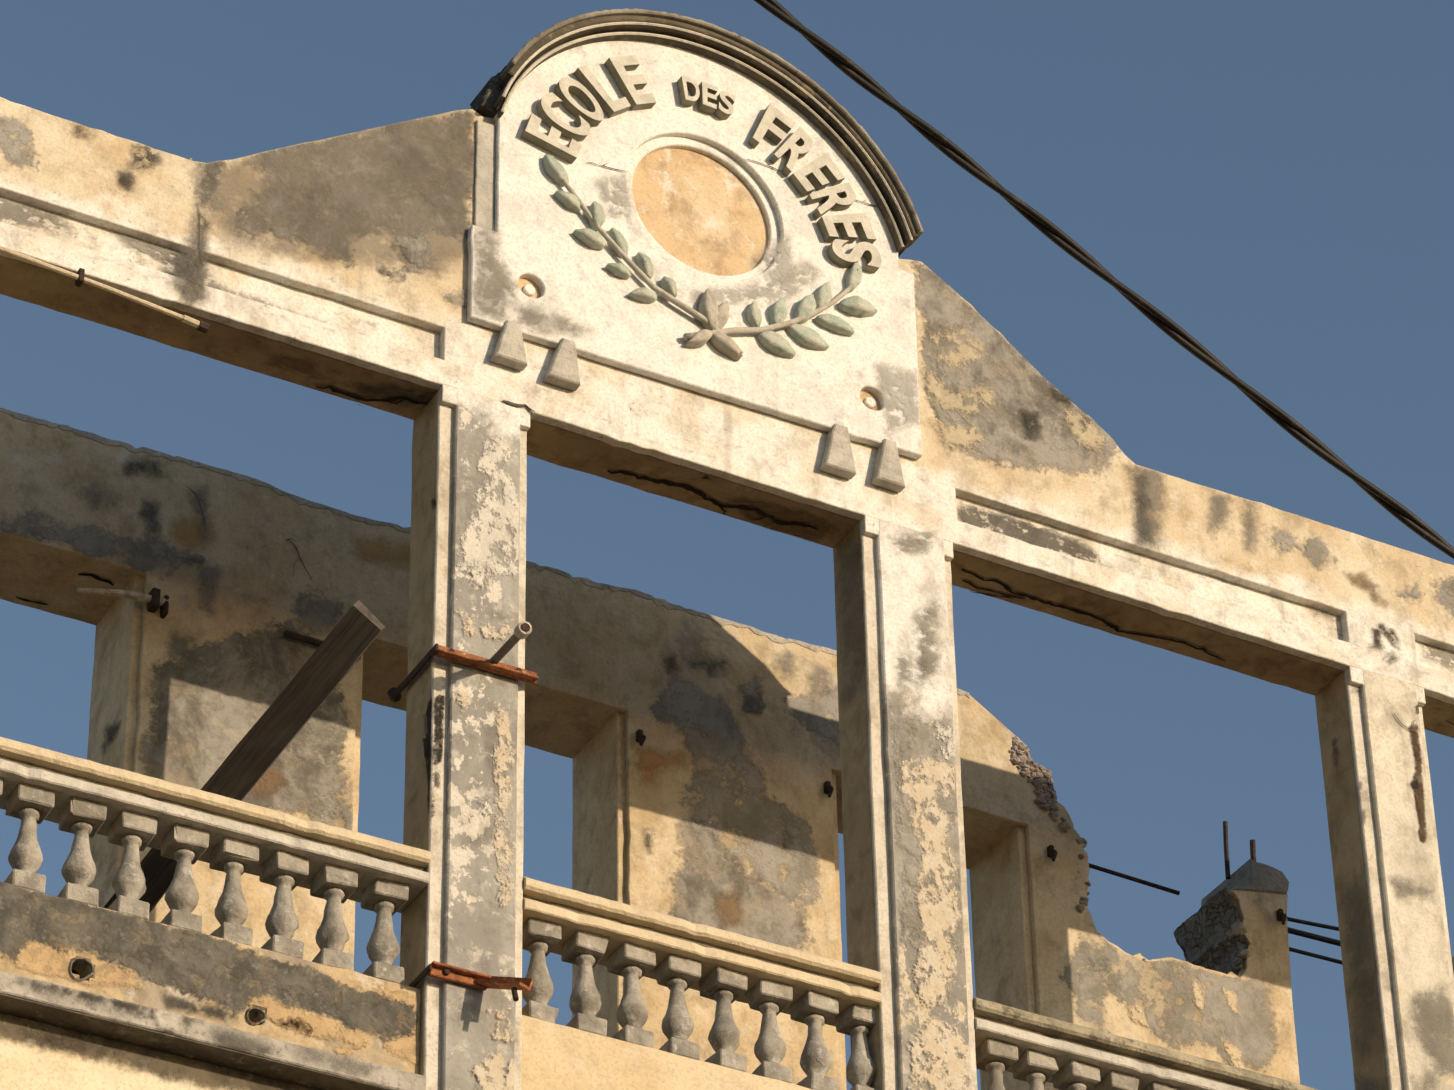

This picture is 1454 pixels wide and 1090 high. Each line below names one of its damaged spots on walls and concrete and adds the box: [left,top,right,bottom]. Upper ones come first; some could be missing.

peeling [457,434,519,591]
crack [608,470,819,530]
leakage [958,506,1099,562]
leakage [1126,466,1164,544]
leakage [1211,495,1230,527]
leakage [1245,503,1256,549]
crack [961,569,1226,662]
spalling [422,688,471,818]
peeling [480,708,516,907]
peeling [893,714,972,1090]
leakage [0,881,418,1053]
peeling [470,1009,514,1090]